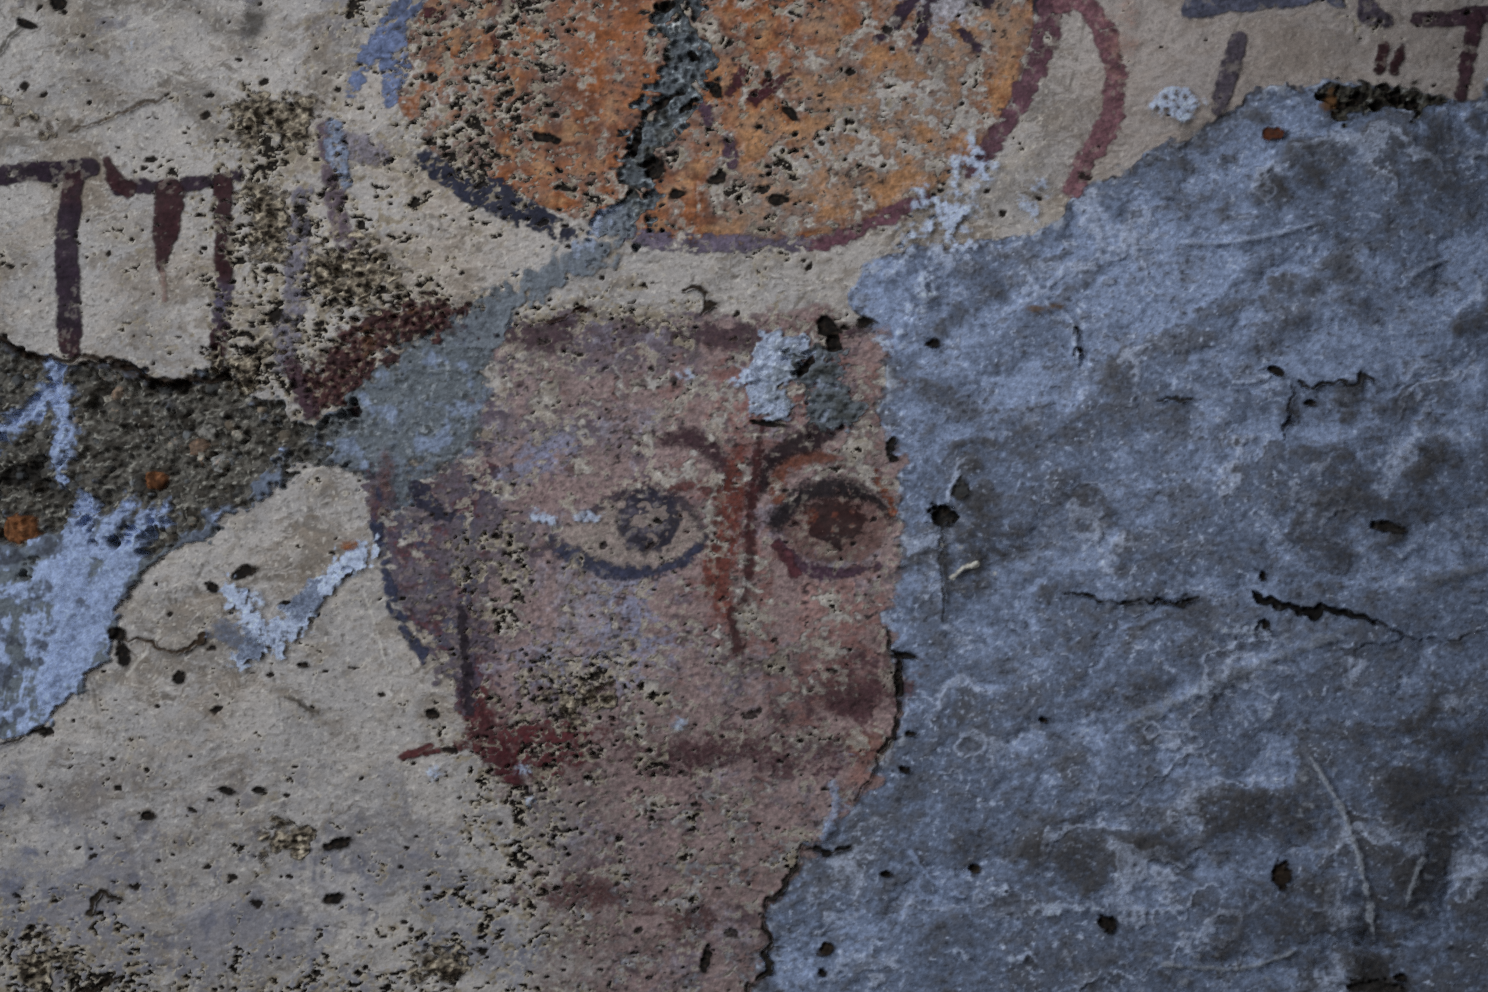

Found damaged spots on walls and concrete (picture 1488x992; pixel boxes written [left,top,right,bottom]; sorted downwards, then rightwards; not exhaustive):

flaking render [782,106,800,121]
flaking render [1314,77,1448,127]
flaking render [706,170,726,185]
flaking render [768,194,789,205]
flaking render [0,0,722,739]
flaking render [739,315,878,433]
spalling [951,476,970,500]
crack [1064,592,1200,608]
crack [1236,571,1403,640]
flaking render [257,815,316,868]